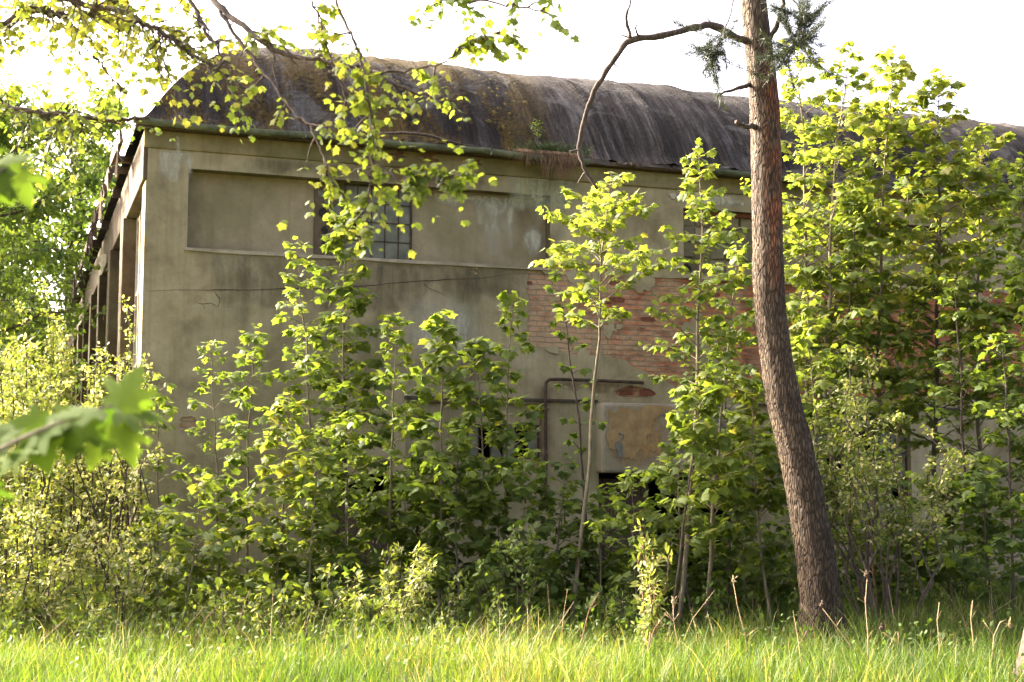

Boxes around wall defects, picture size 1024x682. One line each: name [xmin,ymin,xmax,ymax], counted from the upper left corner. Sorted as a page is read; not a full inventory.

flaking render [525,256,763,469]
flaking render [785,285,1024,403]